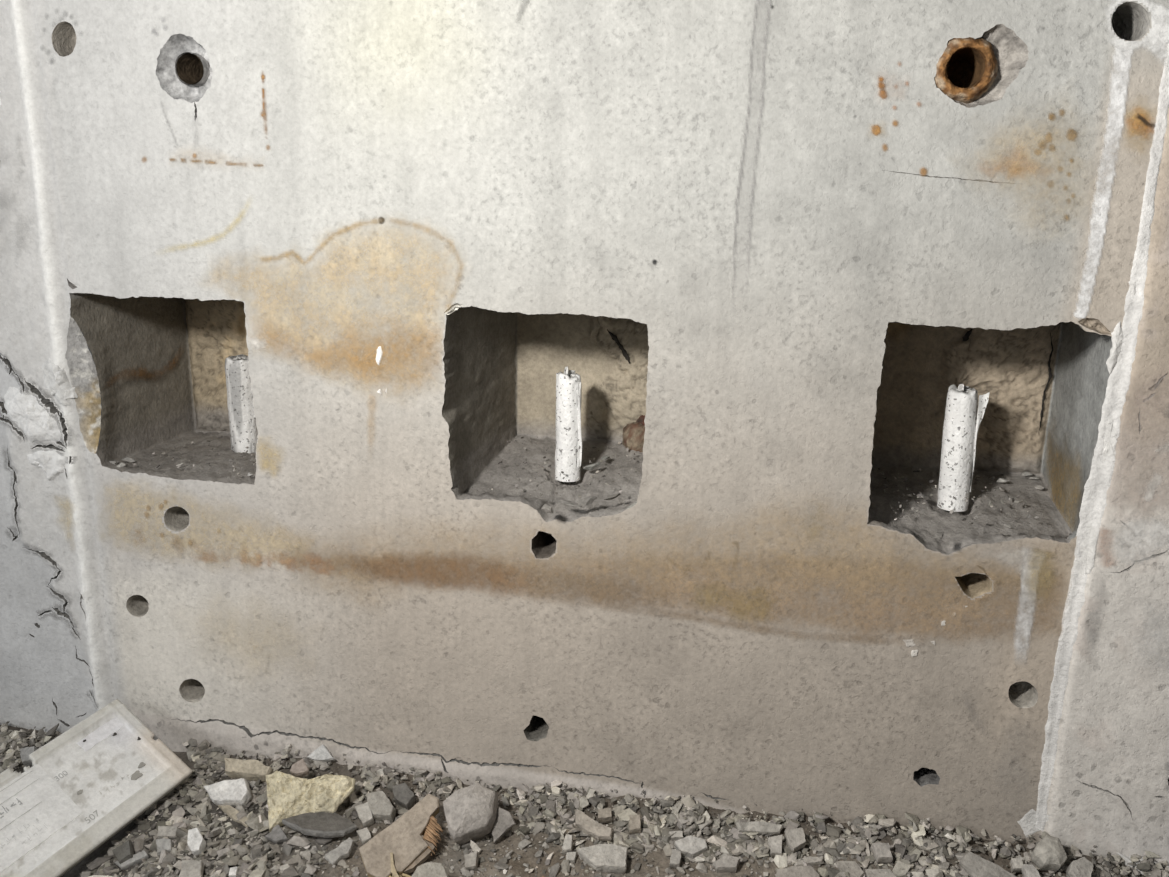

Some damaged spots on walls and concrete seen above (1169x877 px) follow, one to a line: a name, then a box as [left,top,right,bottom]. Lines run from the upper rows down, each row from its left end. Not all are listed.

crack [1138,374,1167,434]
crack [0,355,98,727]
crack [1111,549,1169,573]
water stain [482,549,1055,654]
crack [172,719,644,787]